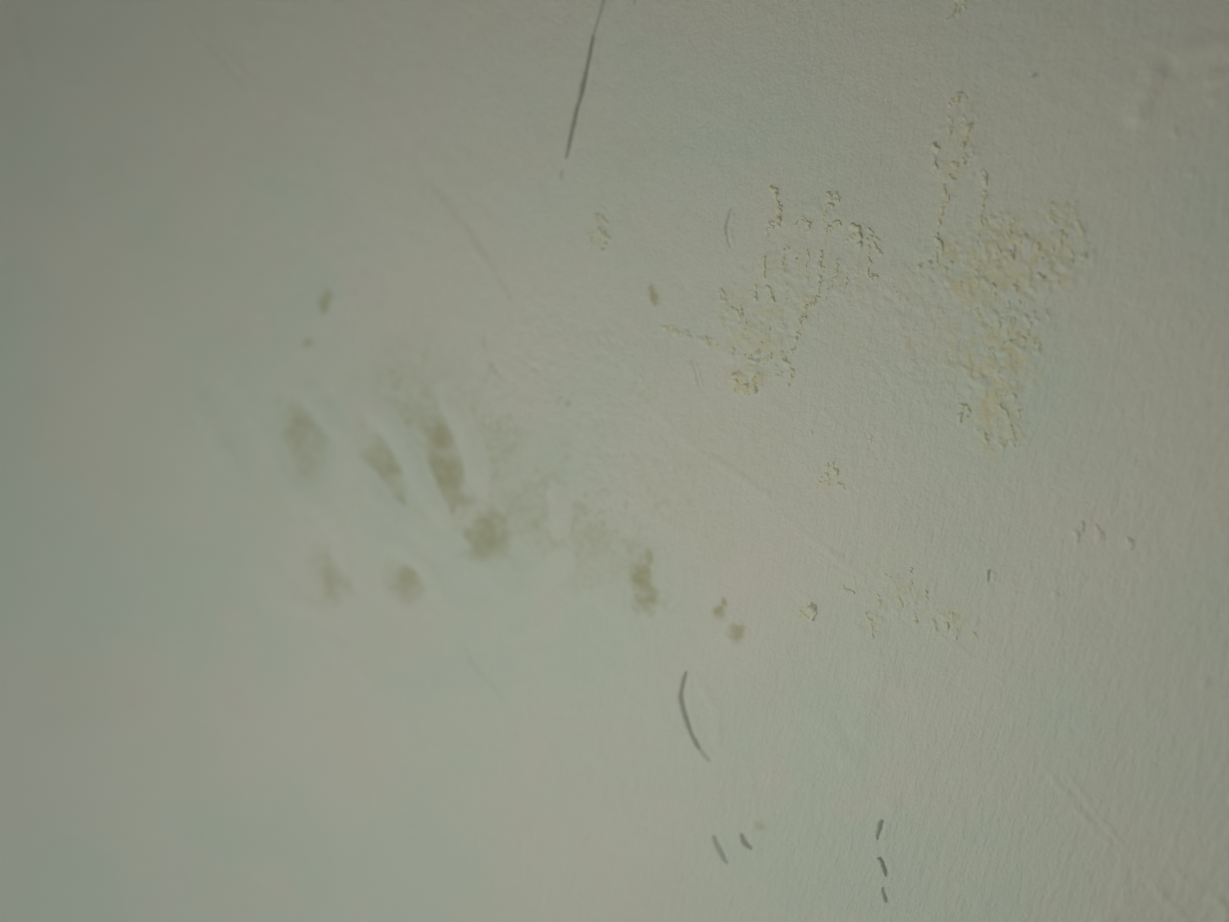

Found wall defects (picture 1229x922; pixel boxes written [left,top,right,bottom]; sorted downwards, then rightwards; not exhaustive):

water stain [353,423,432,524]
water stain [394,388,529,573]
water stain [300,528,428,621]
water stain [619,542,676,626]